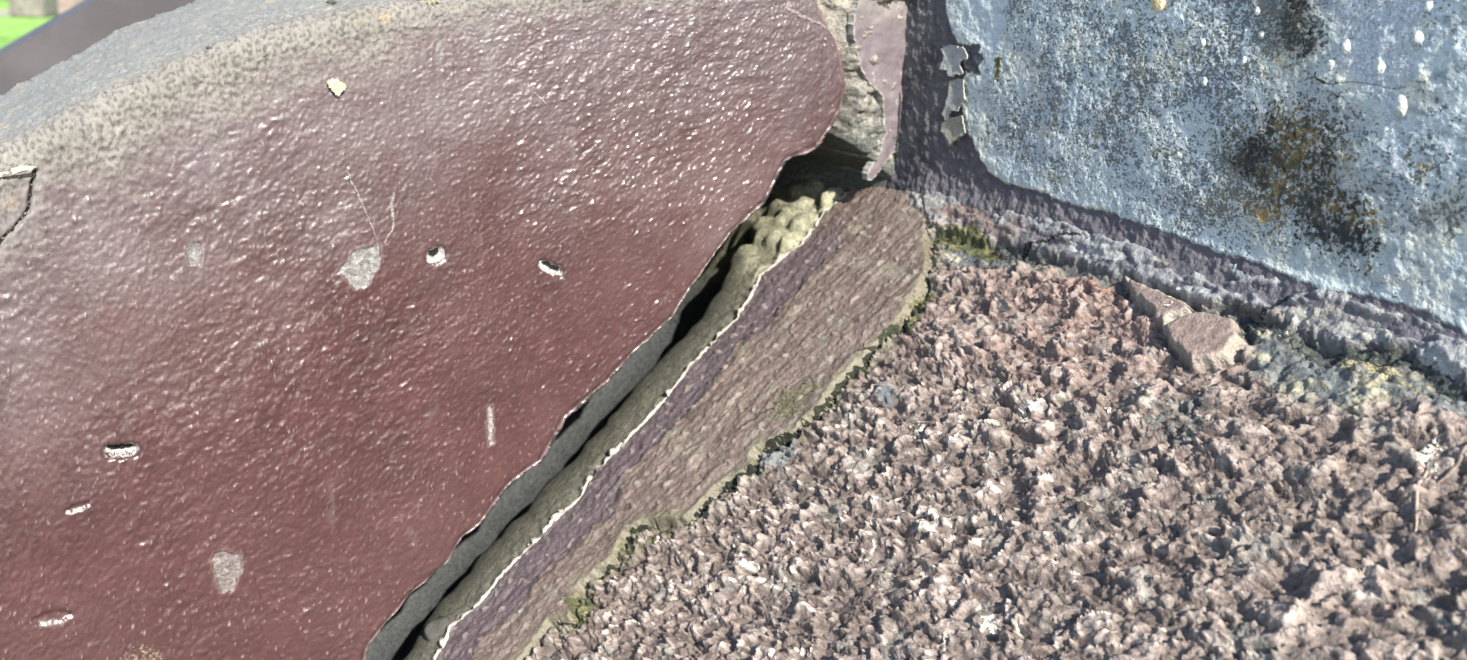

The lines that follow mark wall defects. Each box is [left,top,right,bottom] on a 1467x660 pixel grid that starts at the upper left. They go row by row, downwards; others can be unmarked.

crack [0,170,36,244]
peeling [339,244,380,289]
crack [366,178,847,660]
crack [692,191,935,522]
spalling [770,0,911,225]
peeling [939,43,983,145]
damp [1214,0,1467,276]